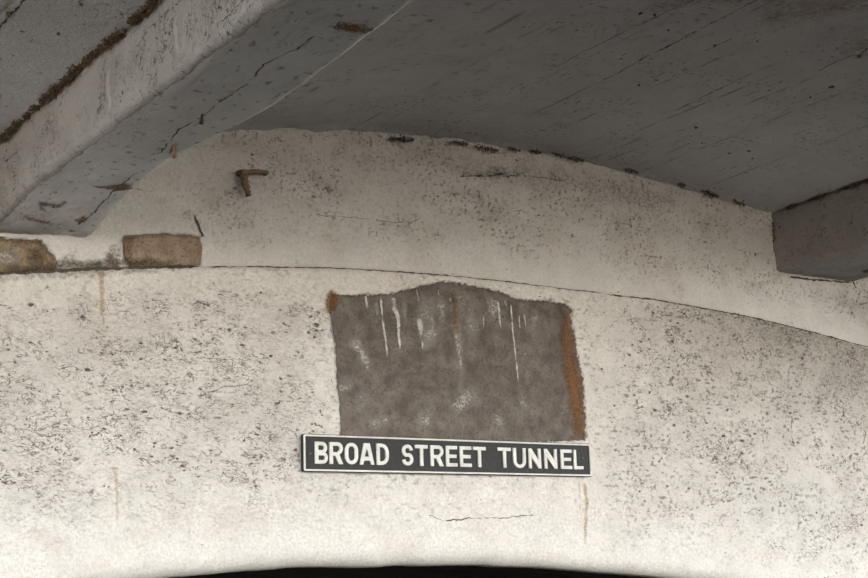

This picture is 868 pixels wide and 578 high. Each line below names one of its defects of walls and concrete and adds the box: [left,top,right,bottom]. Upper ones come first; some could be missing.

spalling [0,237,57,272]
spalling [123,234,202,267]
water stain [380,298,401,356]
water stain [497,301,526,381]
rust [561,314,583,435]
crack [429,514,532,522]